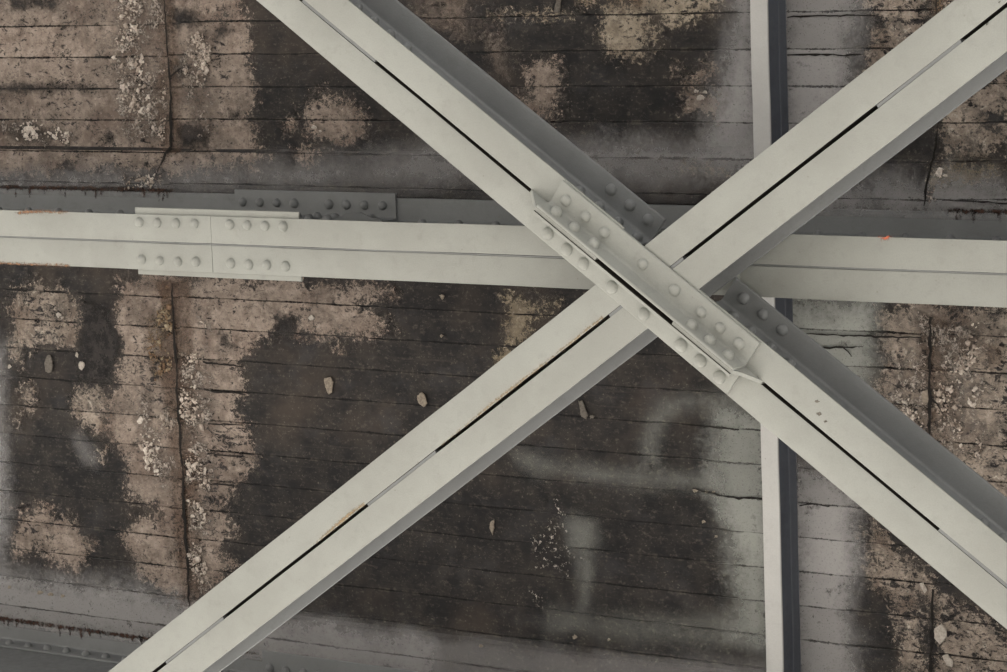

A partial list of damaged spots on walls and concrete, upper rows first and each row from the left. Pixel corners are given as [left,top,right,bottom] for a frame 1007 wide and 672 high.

leakage [7,0,56,10]
leakage [105,0,212,152]
crack [156,0,184,174]
leakage [1,118,73,147]
corrosion [948,208,1007,223]
leakage [74,302,121,387]
crack [203,359,243,367]
crack [204,387,245,395]
leakage [890,312,998,460]
leakage [136,303,213,593]
crack [163,285,234,608]
crack [208,451,248,459]